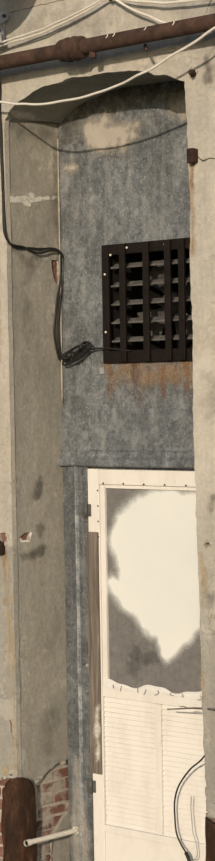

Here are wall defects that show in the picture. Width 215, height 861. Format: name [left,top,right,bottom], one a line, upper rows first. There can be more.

flaking render [0,774,12,861]
flaking render [33,759,70,861]